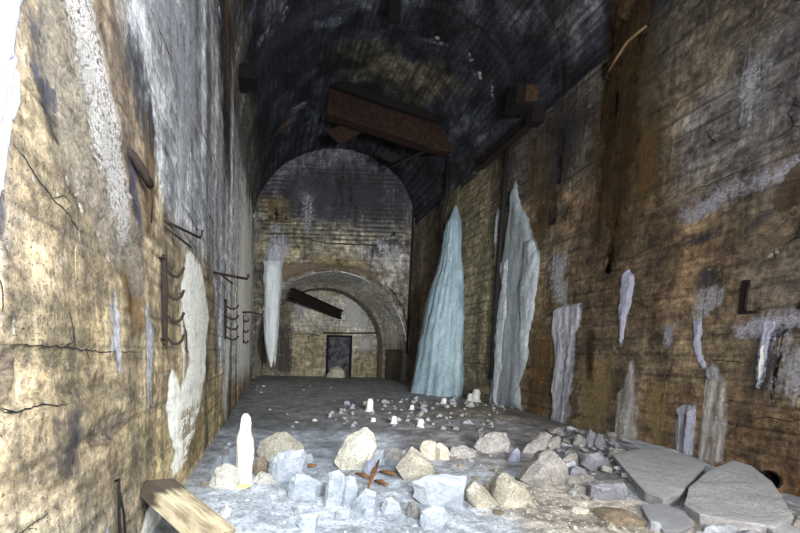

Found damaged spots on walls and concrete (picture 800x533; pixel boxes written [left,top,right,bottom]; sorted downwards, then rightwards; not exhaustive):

leakage [0,0,23,234]
leakage [30,4,57,129]
crack [14,145,82,277]
leakage [678,155,800,225]
crack [1,403,68,418]
crack [0,310,137,359]
leakage [166,250,209,476]
leakage [733,309,800,407]